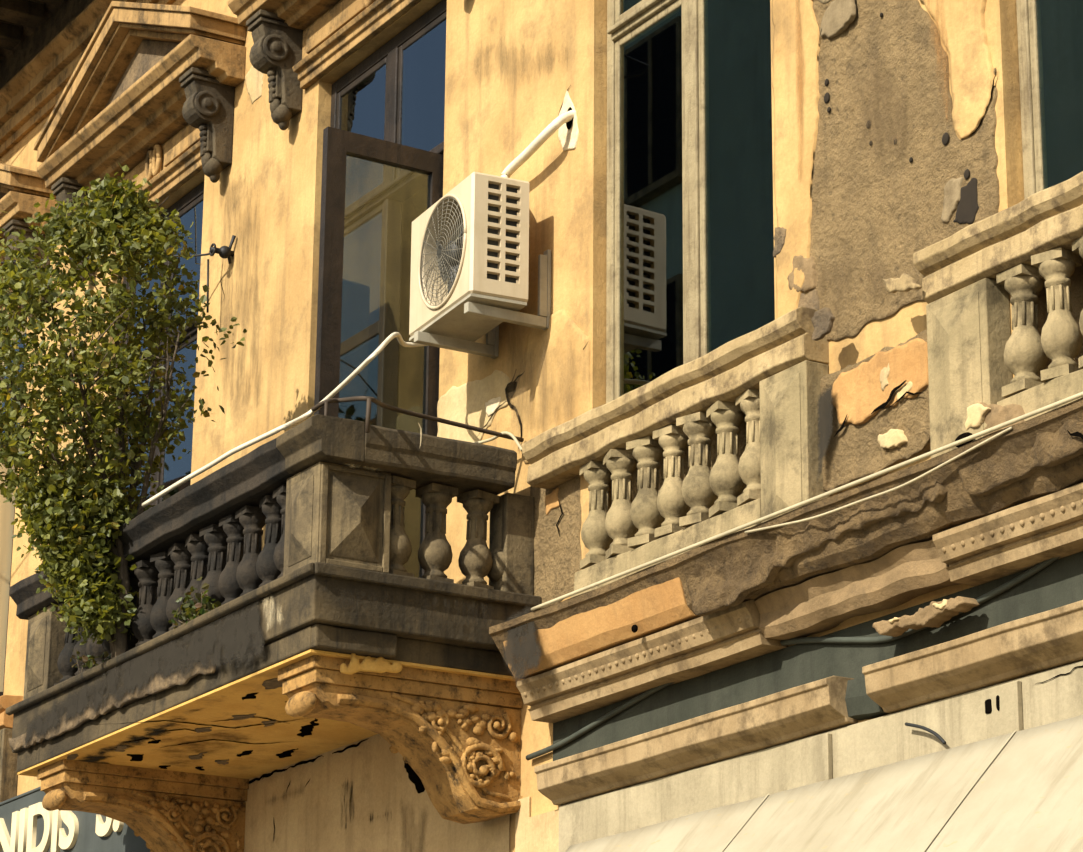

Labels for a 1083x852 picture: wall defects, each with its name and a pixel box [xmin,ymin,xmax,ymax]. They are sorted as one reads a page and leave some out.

peeling [772,0,1000,341]
peeling [437,370,510,442]
crack [477,371,525,449]
spalling [820,330,931,493]
spalling [8,660,216,750]
peeling [115,714,319,771]
peeling [242,678,282,700]
peeling [340,653,403,675]